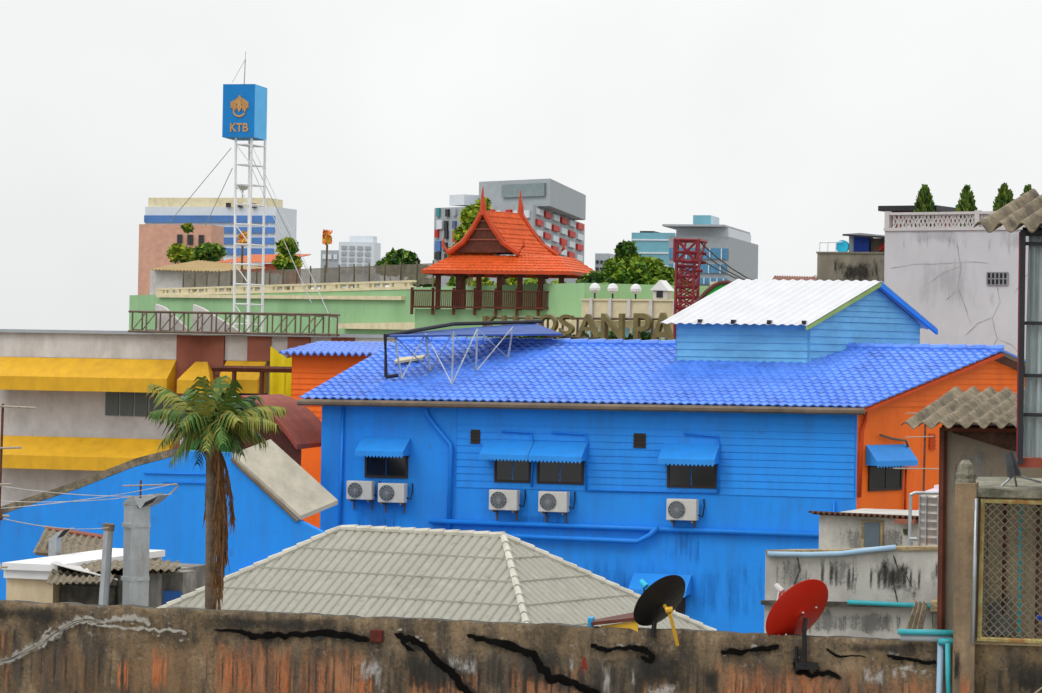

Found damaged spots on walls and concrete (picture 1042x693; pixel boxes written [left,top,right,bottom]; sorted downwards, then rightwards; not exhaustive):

leakage [834,262,879,281]
leakage [821,561,920,594]
leakage [0,607,80,677]
rust [118,653,180,690]
rust [215,645,372,693]
crack [214,628,476,693]
rust [408,673,478,693]
crack [467,634,600,693]
rust [513,671,581,693]
crack [591,643,656,664]
rust [717,665,836,693]
crack [720,643,937,680]